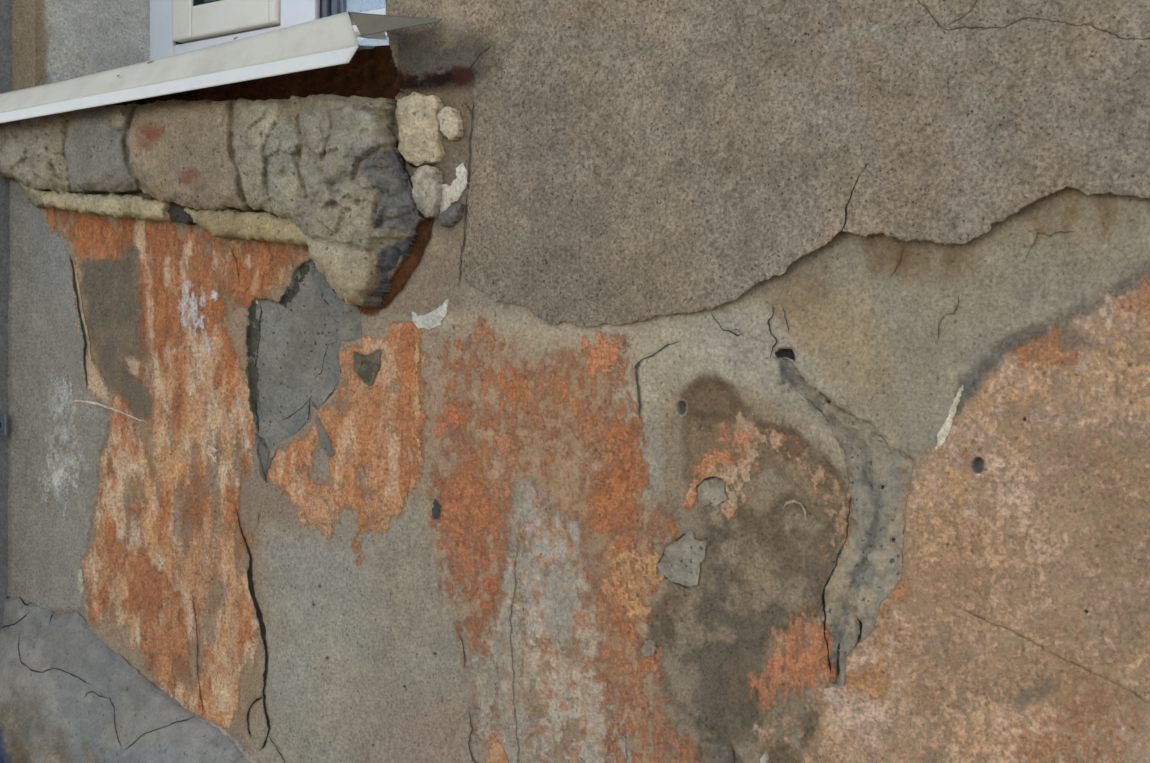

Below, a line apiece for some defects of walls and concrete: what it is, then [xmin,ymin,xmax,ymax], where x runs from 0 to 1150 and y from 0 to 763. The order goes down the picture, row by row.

crack [918,0,1150,40]
flaking render [395,92,469,227]
crack [2,590,203,750]
crack [236,509,285,763]
crack [257,438,279,483]
peeling [40,208,1150,763]
leakage [648,376,847,763]
crack [822,496,851,673]